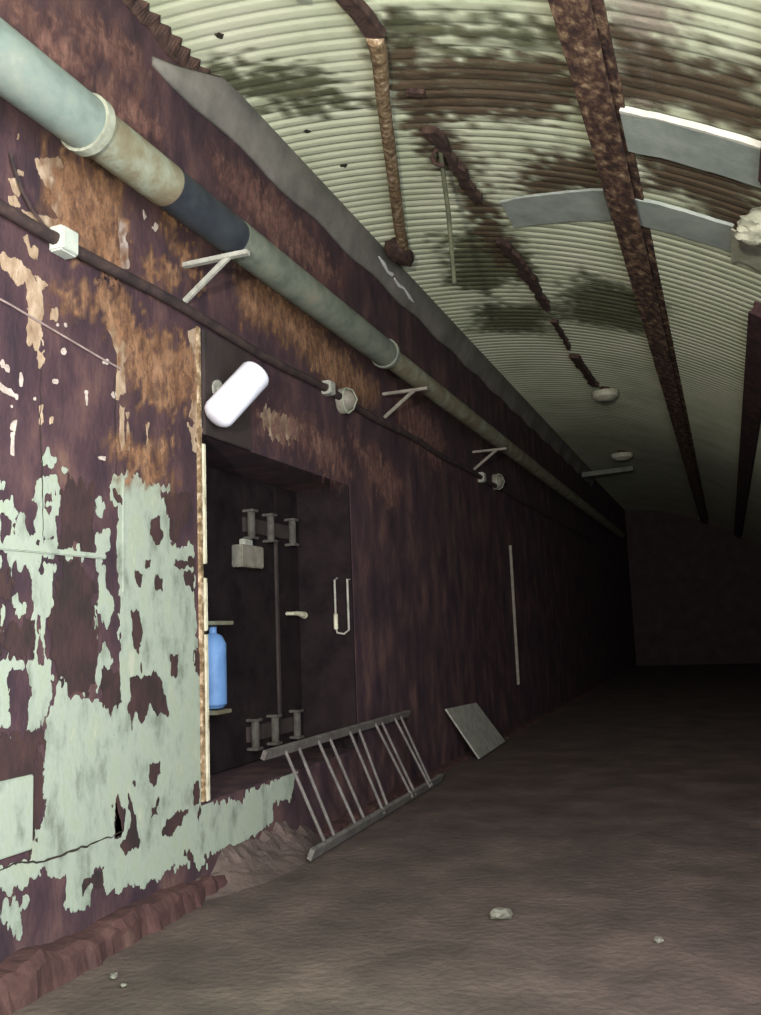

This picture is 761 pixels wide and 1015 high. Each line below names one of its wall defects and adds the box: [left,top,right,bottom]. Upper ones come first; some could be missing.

leakage [206,53,375,119]
leakage [609,0,761,141]
peeling [8,156,64,228]
leakage [375,6,644,334]
leakage [635,154,761,231]
peeling [0,234,67,369]
rust [41,142,206,418]
peeling [0,359,24,408]
peeling [33,397,54,425]
peeling [102,323,130,452]
peeling [187,328,203,453]
peeling [0,447,298,941]